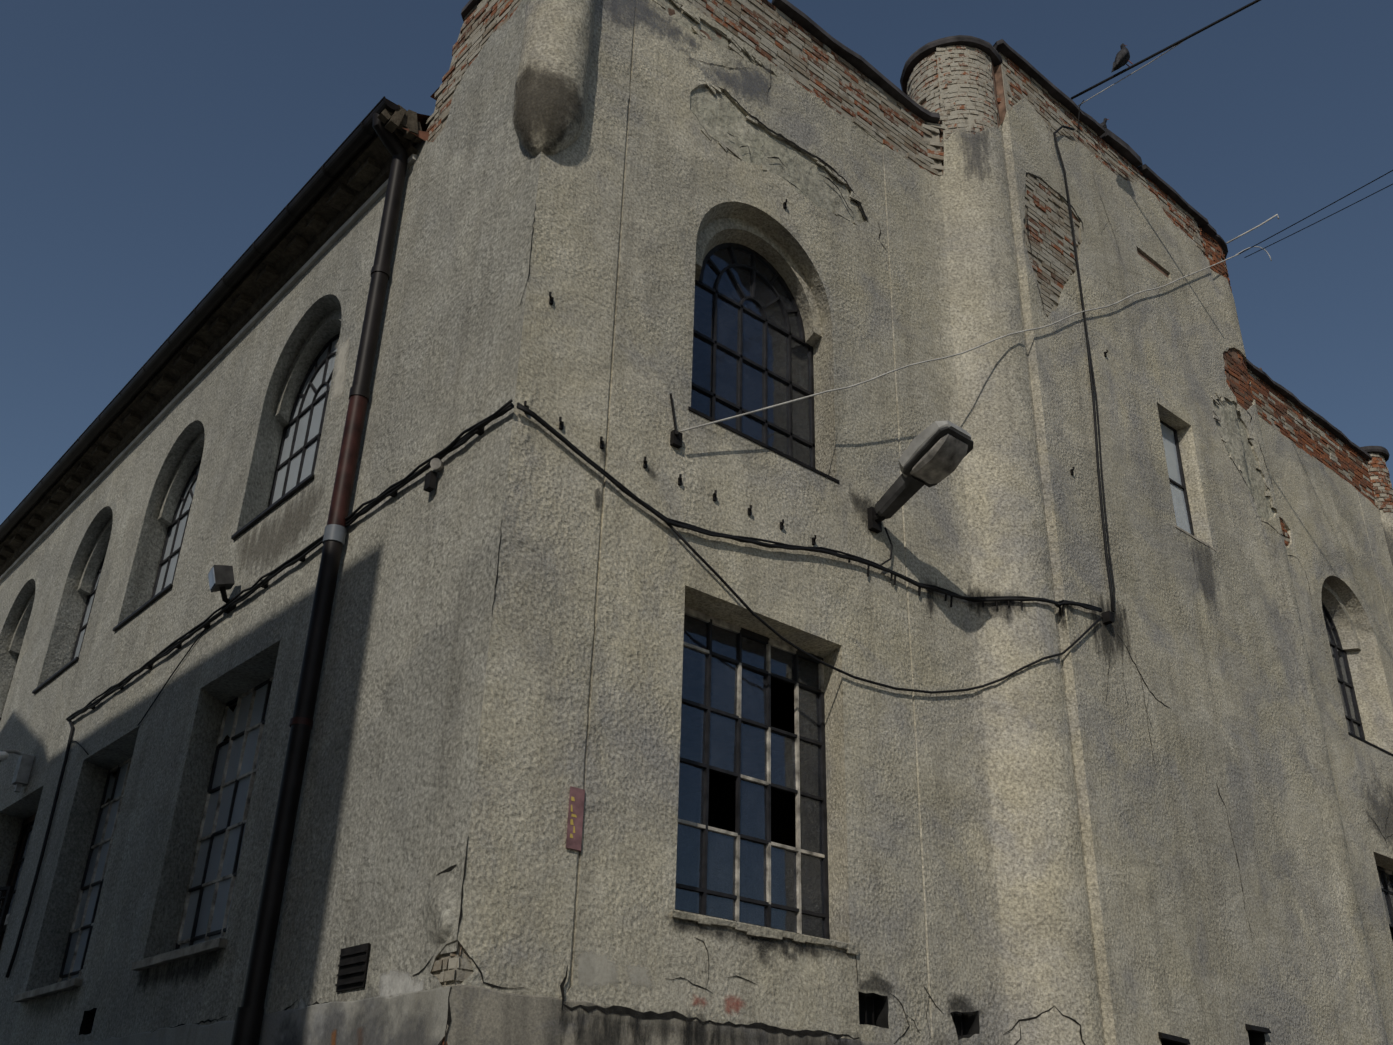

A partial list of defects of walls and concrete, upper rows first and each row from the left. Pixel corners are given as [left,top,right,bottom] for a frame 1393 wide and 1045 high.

water stain [609,0,696,46]
water stain [513,64,584,153]
flaking render [653,0,1232,291]
flaking render [1023,172,1084,318]
flaking render [1211,347,1378,548]
spalling [430,939,473,986]
crack [412,839,524,1045]
water stain [565,1007,645,1045]
crack [560,937,859,1040]
water stain [661,1017,774,1045]
crack [890,985,944,1044]
crack [1003,1006,1086,1045]